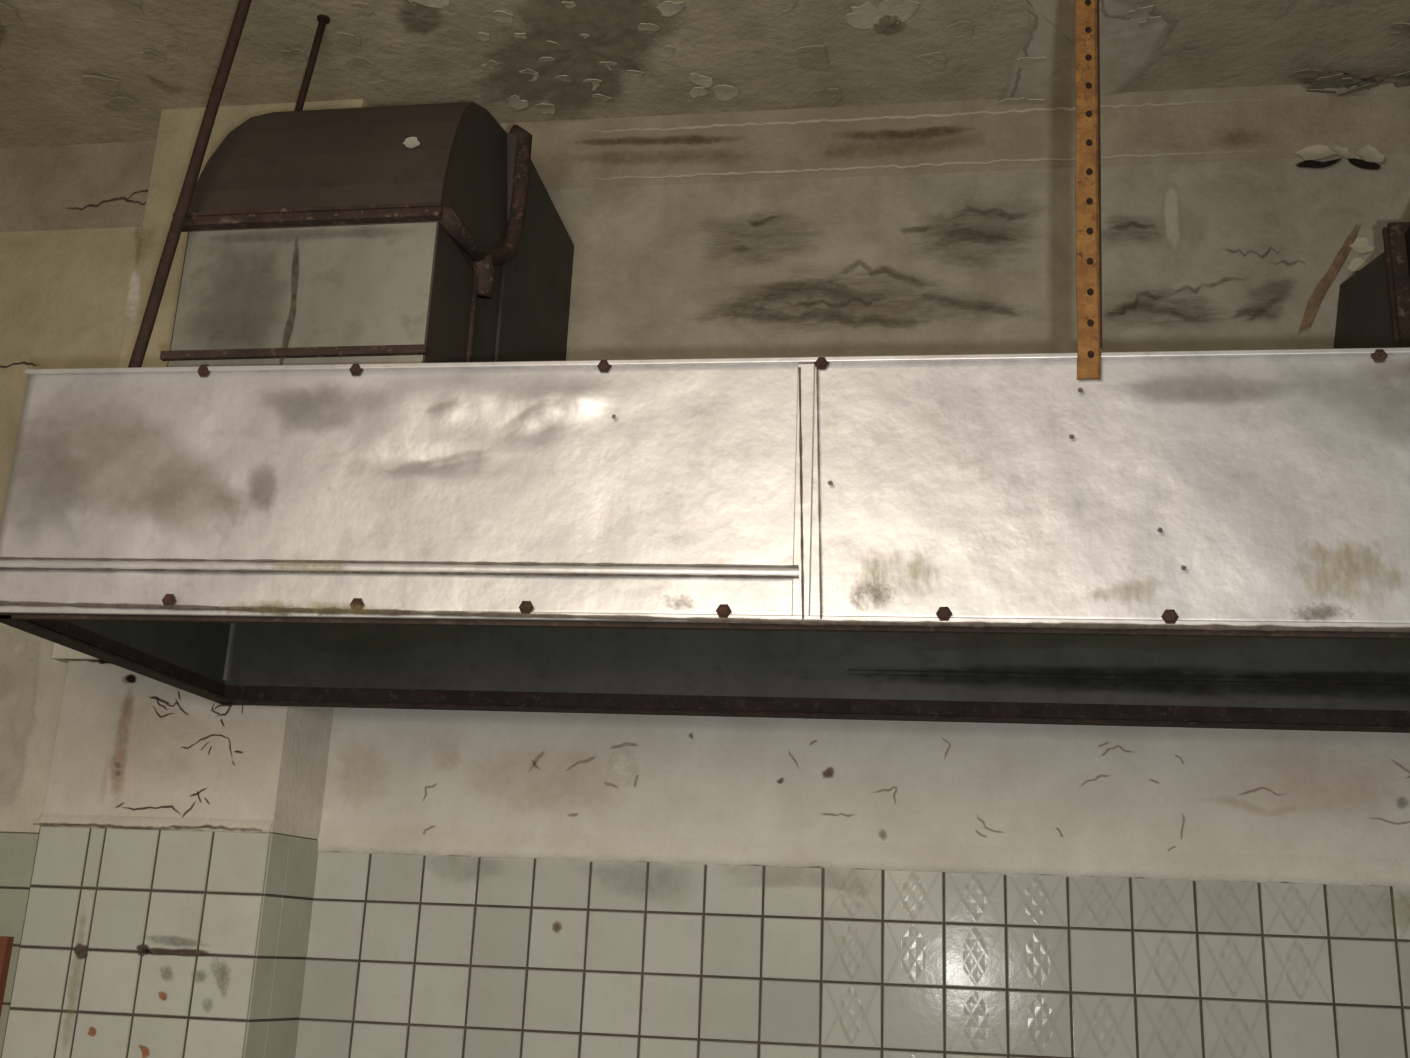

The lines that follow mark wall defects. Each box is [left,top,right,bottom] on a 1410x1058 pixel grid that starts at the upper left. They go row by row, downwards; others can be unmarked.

peeling [401,0,450,33]
crack [37,691,255,830]